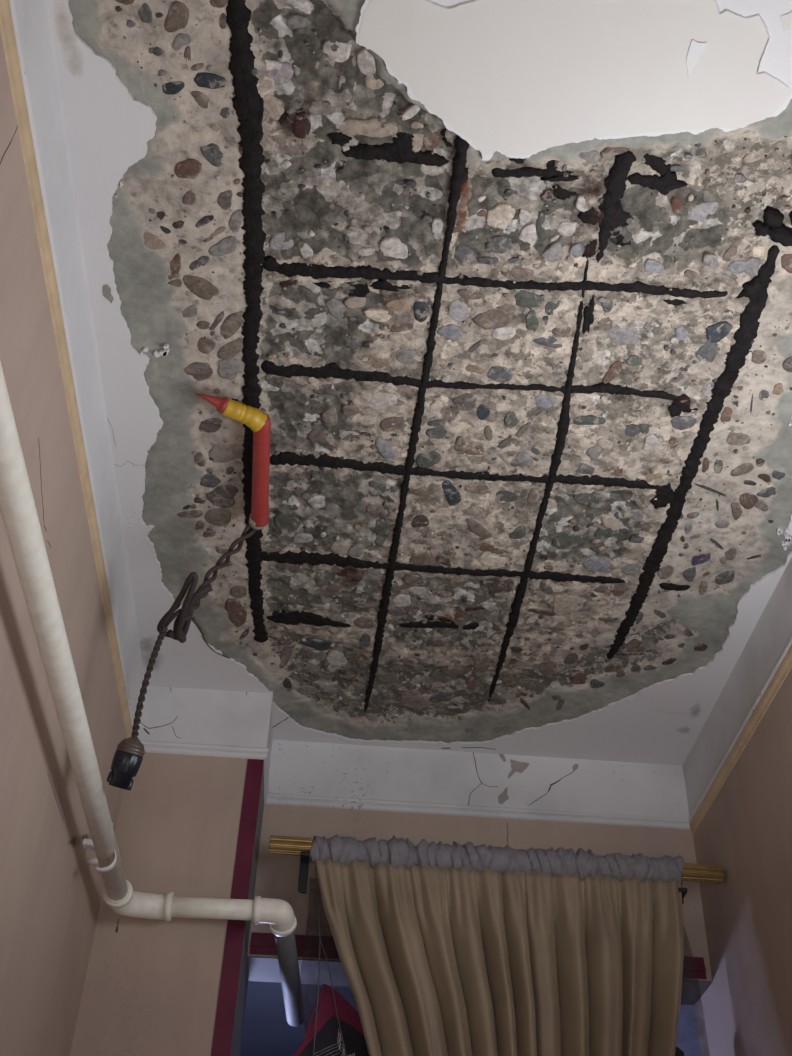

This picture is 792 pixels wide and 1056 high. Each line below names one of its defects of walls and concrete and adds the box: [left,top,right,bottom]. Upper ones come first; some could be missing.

spalling [68,0,792,743]
crack [441,747,498,805]
peeling [498,754,530,804]
crack [529,772,573,805]